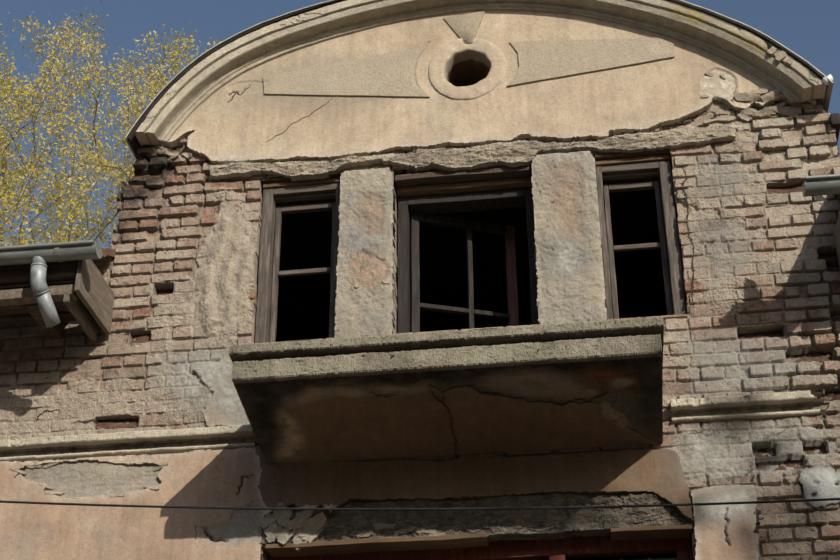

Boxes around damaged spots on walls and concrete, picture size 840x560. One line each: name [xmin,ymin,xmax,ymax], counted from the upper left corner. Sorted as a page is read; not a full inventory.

spalling [686,70,811,128]
crack [268,98,333,141]
crack [527,97,787,143]
spalling [137,143,192,164]
spalling [786,352,833,363]
crack [467,385,610,406]
spalling [96,419,139,430]
spalling [753,446,827,471]
peeling [10,460,168,499]
crack [195,526,226,542]
flaking render [227,501,337,552]
peeling [350,523,446,538]